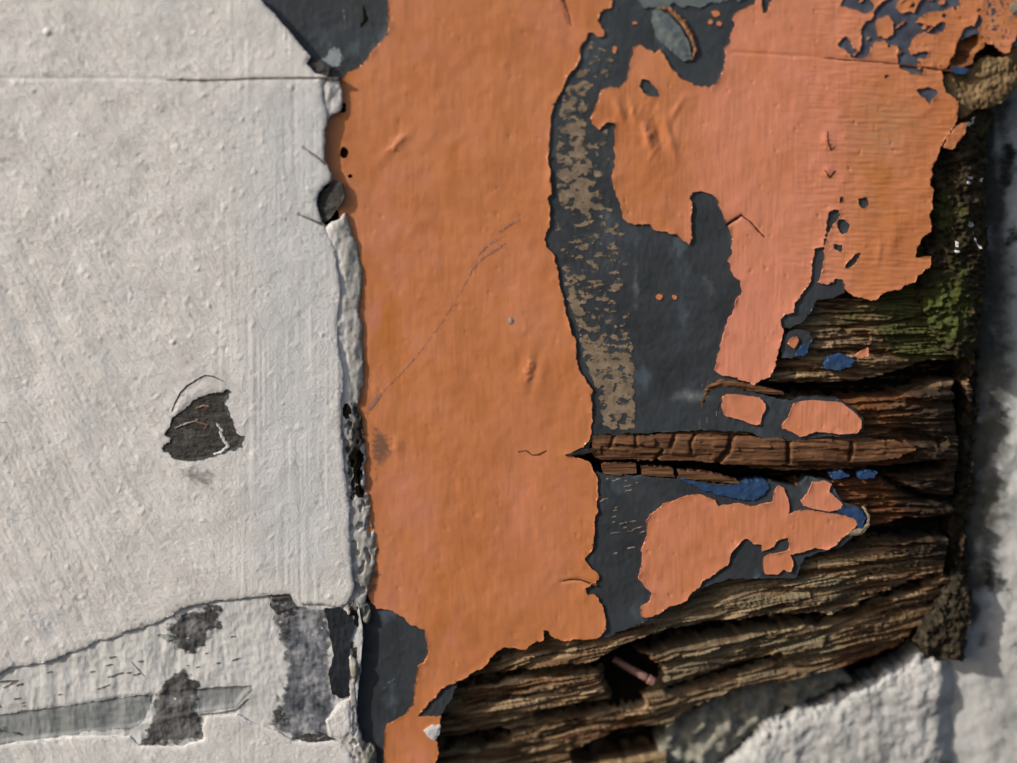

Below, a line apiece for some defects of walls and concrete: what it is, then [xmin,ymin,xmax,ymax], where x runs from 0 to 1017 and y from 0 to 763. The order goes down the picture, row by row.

peeling [262,0,388,82]
peeling [838,0,960,74]
peeling [958,8,995,49]
crack [166,75,339,83]
peeling [916,87,938,104]
peeling [940,122,968,150]
peeling [317,174,352,223]
peeling [544,0,864,456]
peeling [162,375,244,461]
hole [348,447,364,498]
peeling [585,467,878,638]
peeling [0,594,458,763]